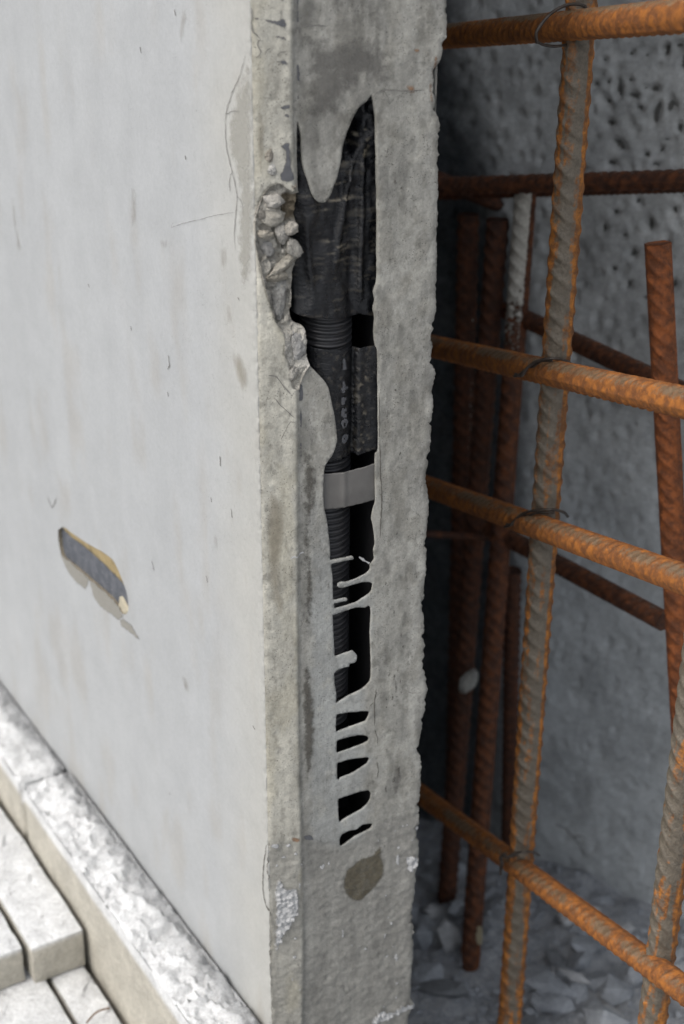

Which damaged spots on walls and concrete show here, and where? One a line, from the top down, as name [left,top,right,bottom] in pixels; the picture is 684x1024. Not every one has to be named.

crack [171,9,287,243]
spalling [253,148,310,390]
spalling [61,556,139,639]